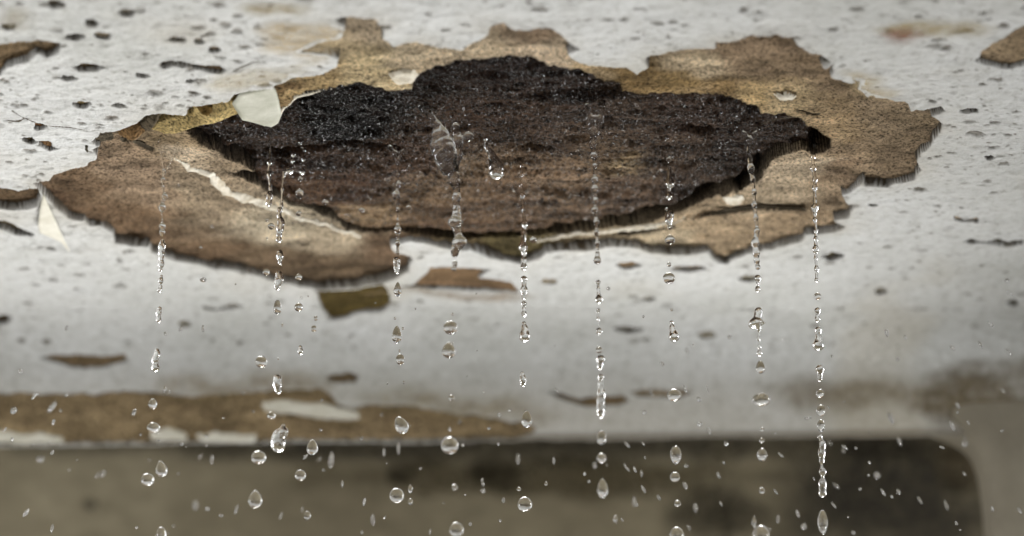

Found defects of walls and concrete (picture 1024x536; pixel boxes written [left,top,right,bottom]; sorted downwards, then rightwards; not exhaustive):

spalling [0,16,940,317]
spalling [980,26,1024,64]